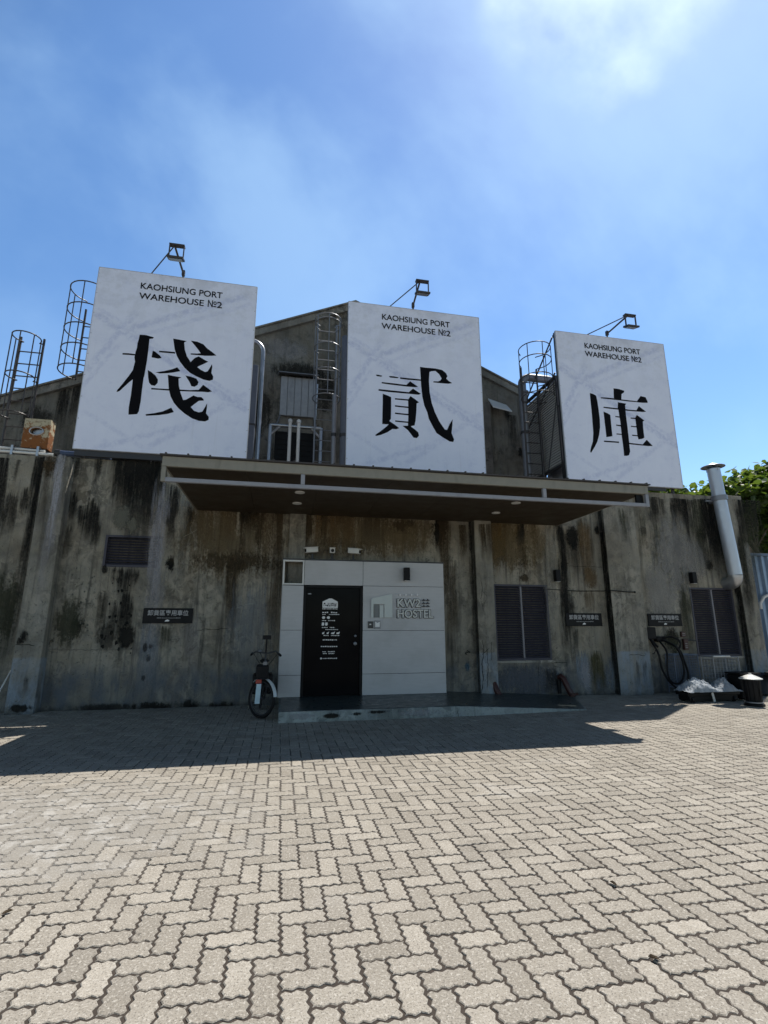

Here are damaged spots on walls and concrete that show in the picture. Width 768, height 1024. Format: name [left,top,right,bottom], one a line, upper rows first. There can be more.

leakage [0,454,100,646]
leakage [96,459,195,662]
leakage [203,512,283,614]
leakage [557,510,621,693]
leakage [640,497,721,653]